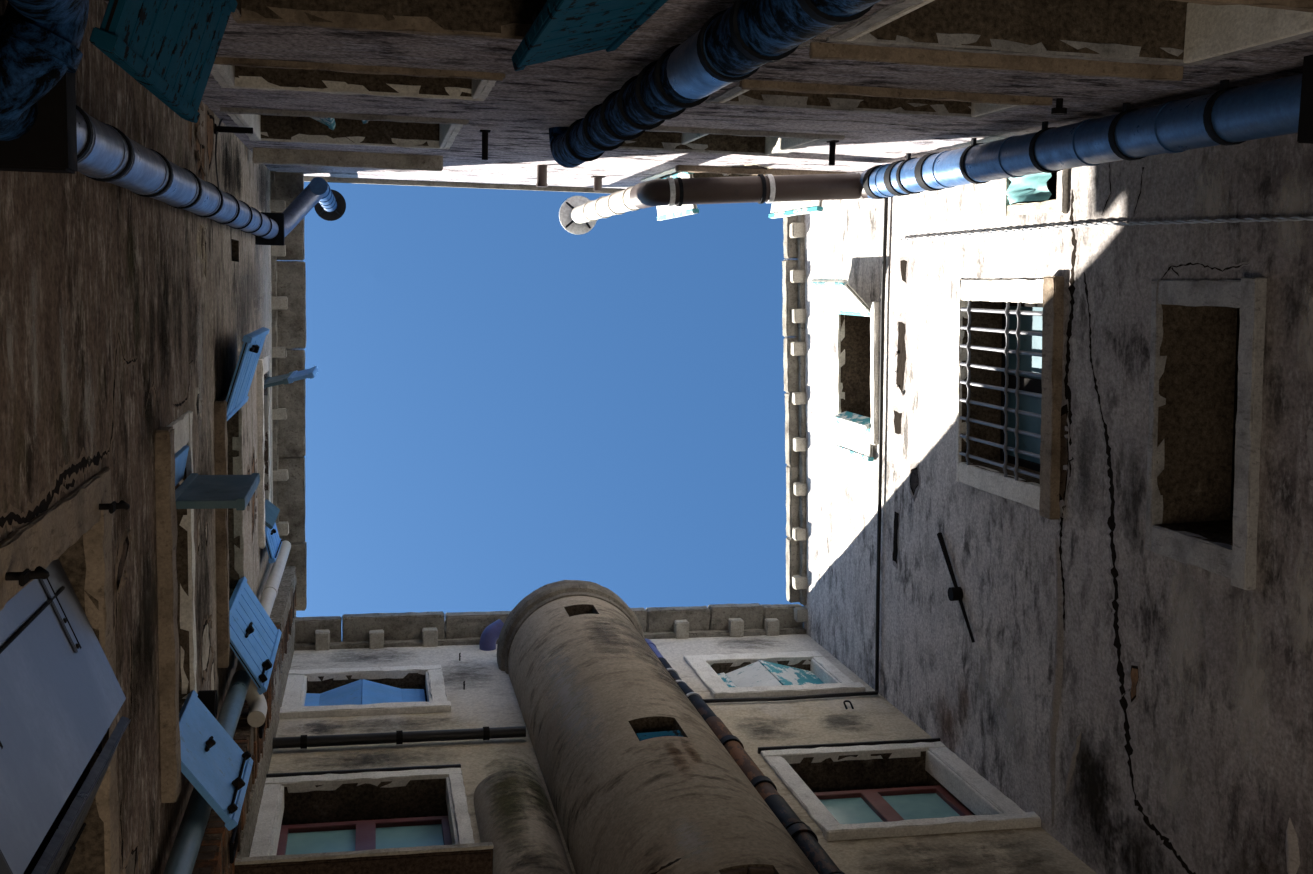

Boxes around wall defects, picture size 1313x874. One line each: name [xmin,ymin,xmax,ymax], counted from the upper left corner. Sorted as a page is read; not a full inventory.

peeling [188,100,215,181]
crack [1160,261,1250,280]
crack [0,331,138,534]
crack [1057,162,1197,874]
peeling [199,613,215,691]